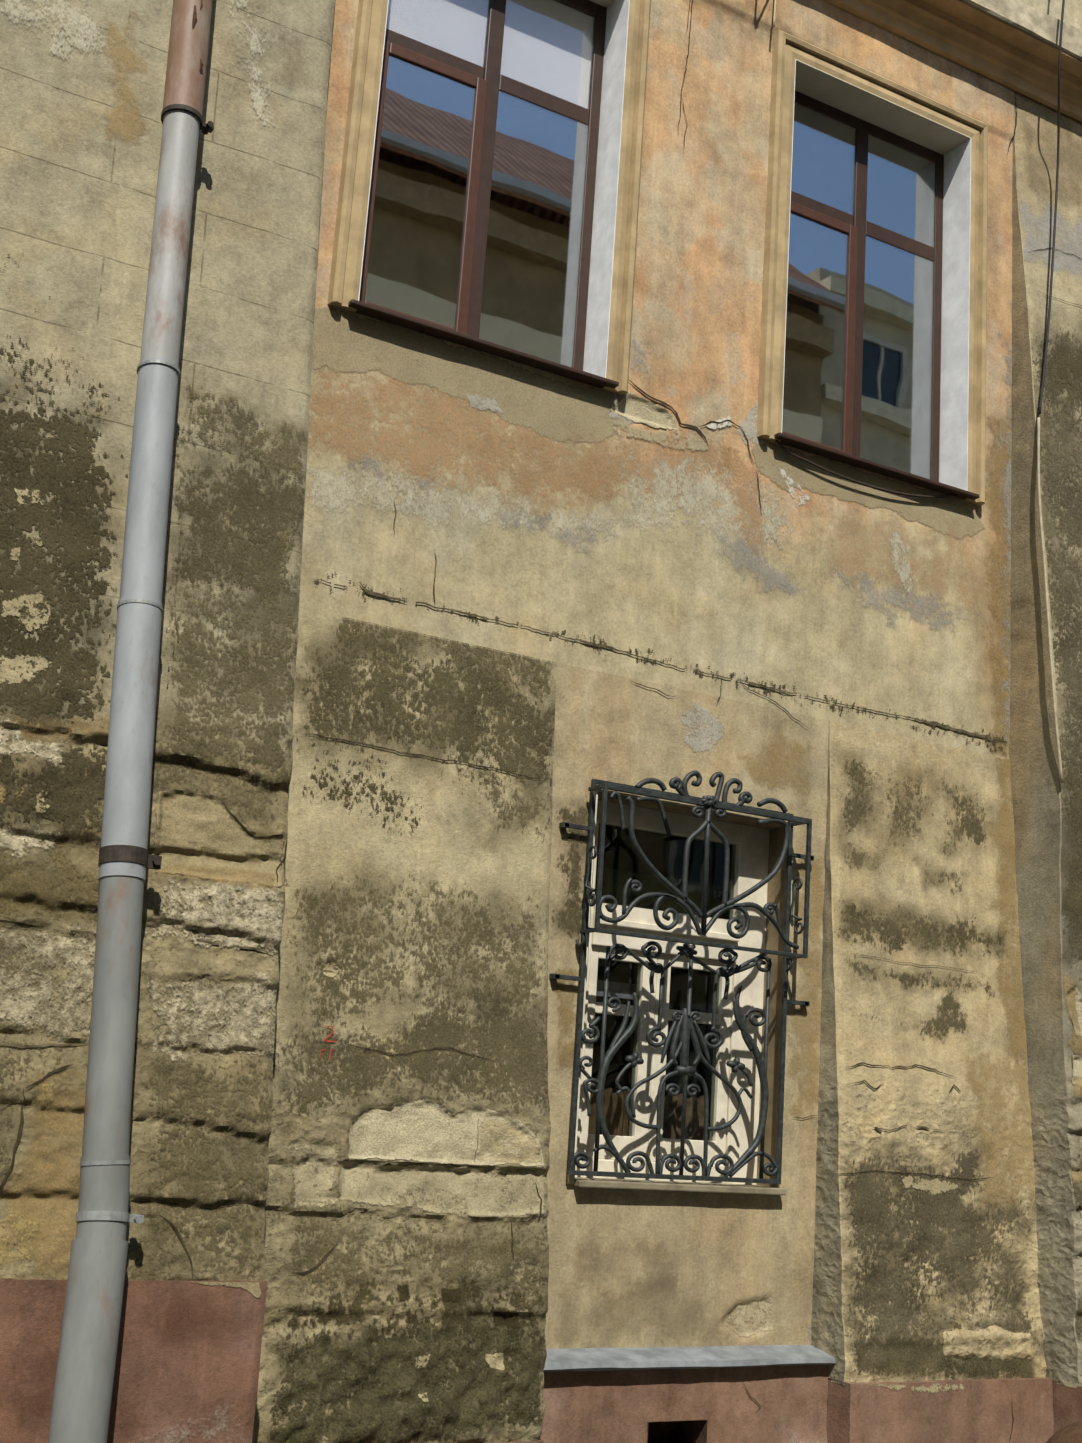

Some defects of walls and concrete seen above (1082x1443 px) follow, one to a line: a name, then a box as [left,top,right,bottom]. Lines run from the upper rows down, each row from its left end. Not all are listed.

crack [678,0,693,152]
crack [629,380,762,515]
water stain [0,335,130,928]
crack [312,554,1007,744]
flaking render [0,826,60,857]
flaking render [146,791,285,952]
water stain [126,385,607,1402]
flaking render [0,926,96,1041]
flaking render [147,969,279,1061]
water stain [834,900,1009,1044]
crack [0,1064,73,1190]
water stain [843,1144,1044,1379]